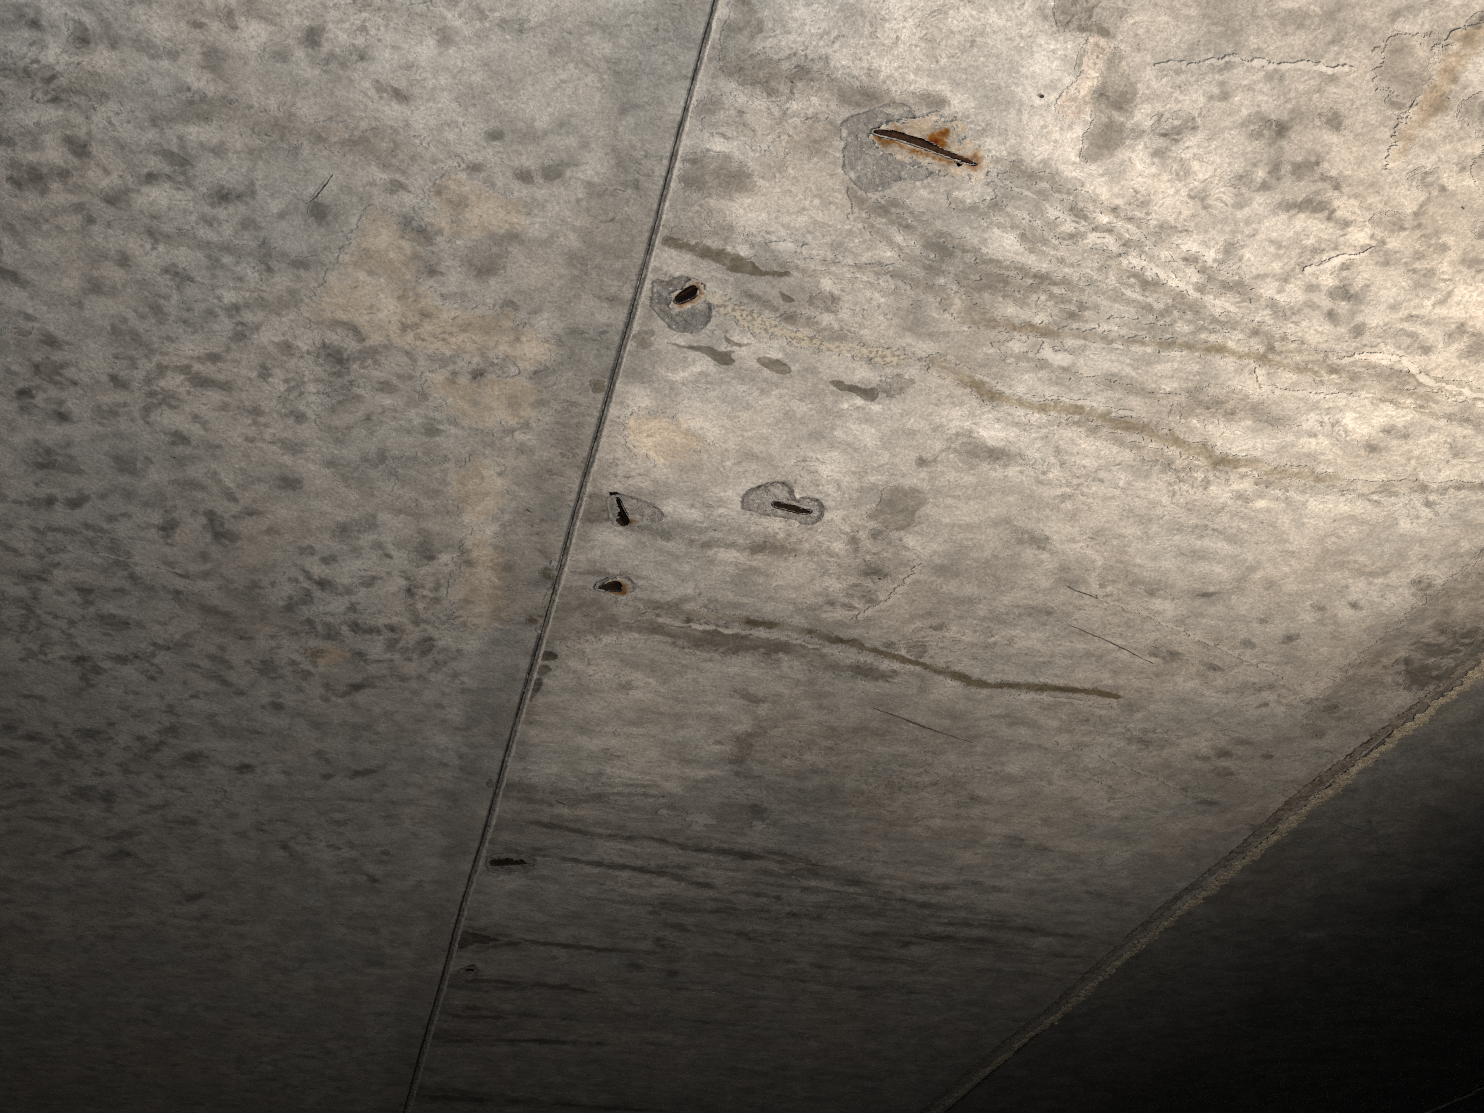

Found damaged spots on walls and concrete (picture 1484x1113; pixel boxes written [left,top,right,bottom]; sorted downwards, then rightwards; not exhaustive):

damp [0,0,1124,711]
damp [0,722,212,827]
damp [53,814,204,863]
damp [286,763,449,828]